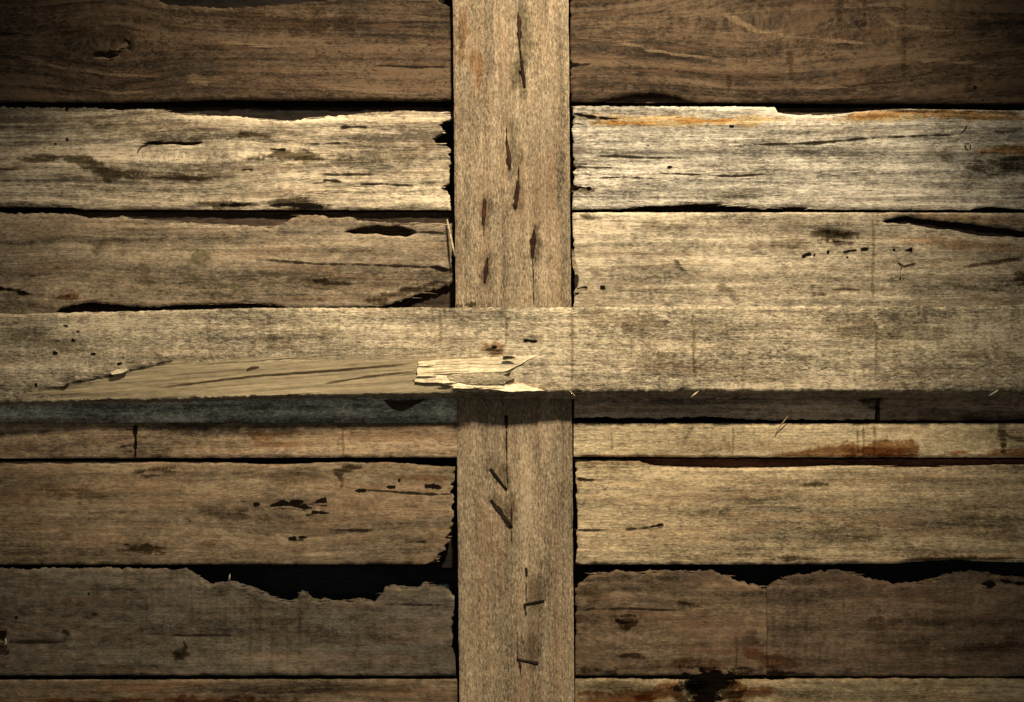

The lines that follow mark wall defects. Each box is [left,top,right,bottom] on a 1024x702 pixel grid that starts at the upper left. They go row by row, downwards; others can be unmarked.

corrosion [505,127,520,209]
spalling [29,350,511,412]
corrosion [490,499,513,543]
spalling [982,579,1024,589]